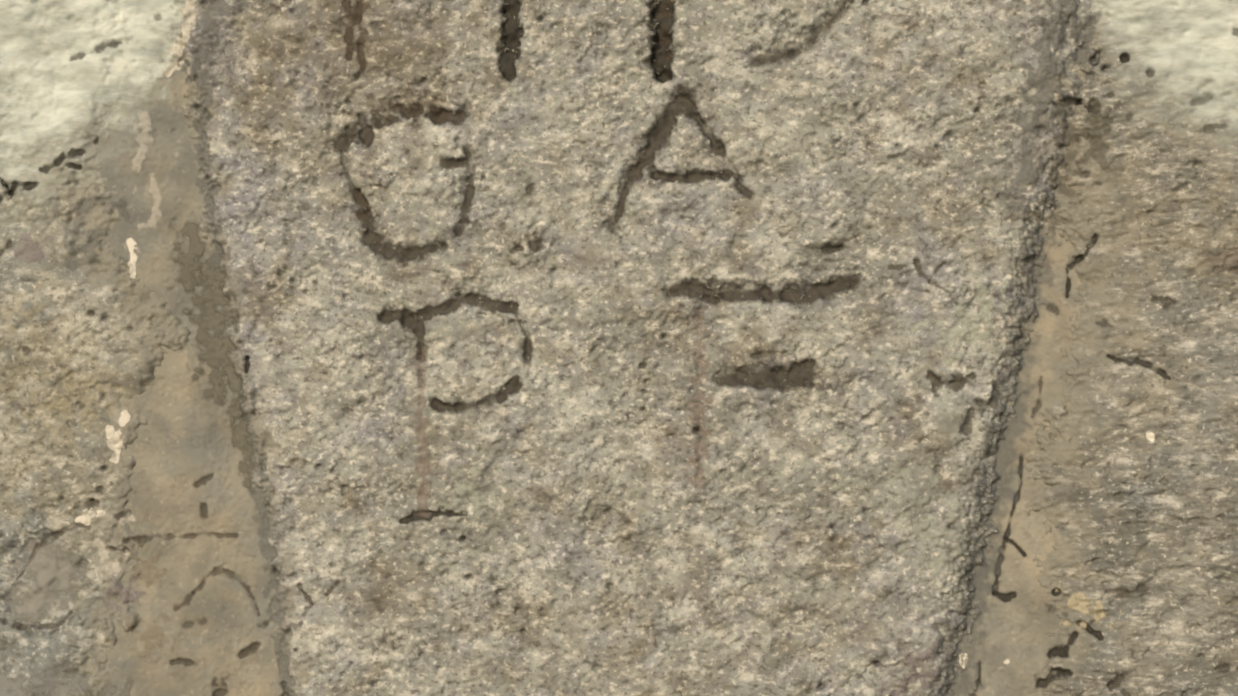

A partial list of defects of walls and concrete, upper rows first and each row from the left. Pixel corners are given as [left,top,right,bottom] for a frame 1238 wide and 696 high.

crack [992,456,1027,602]